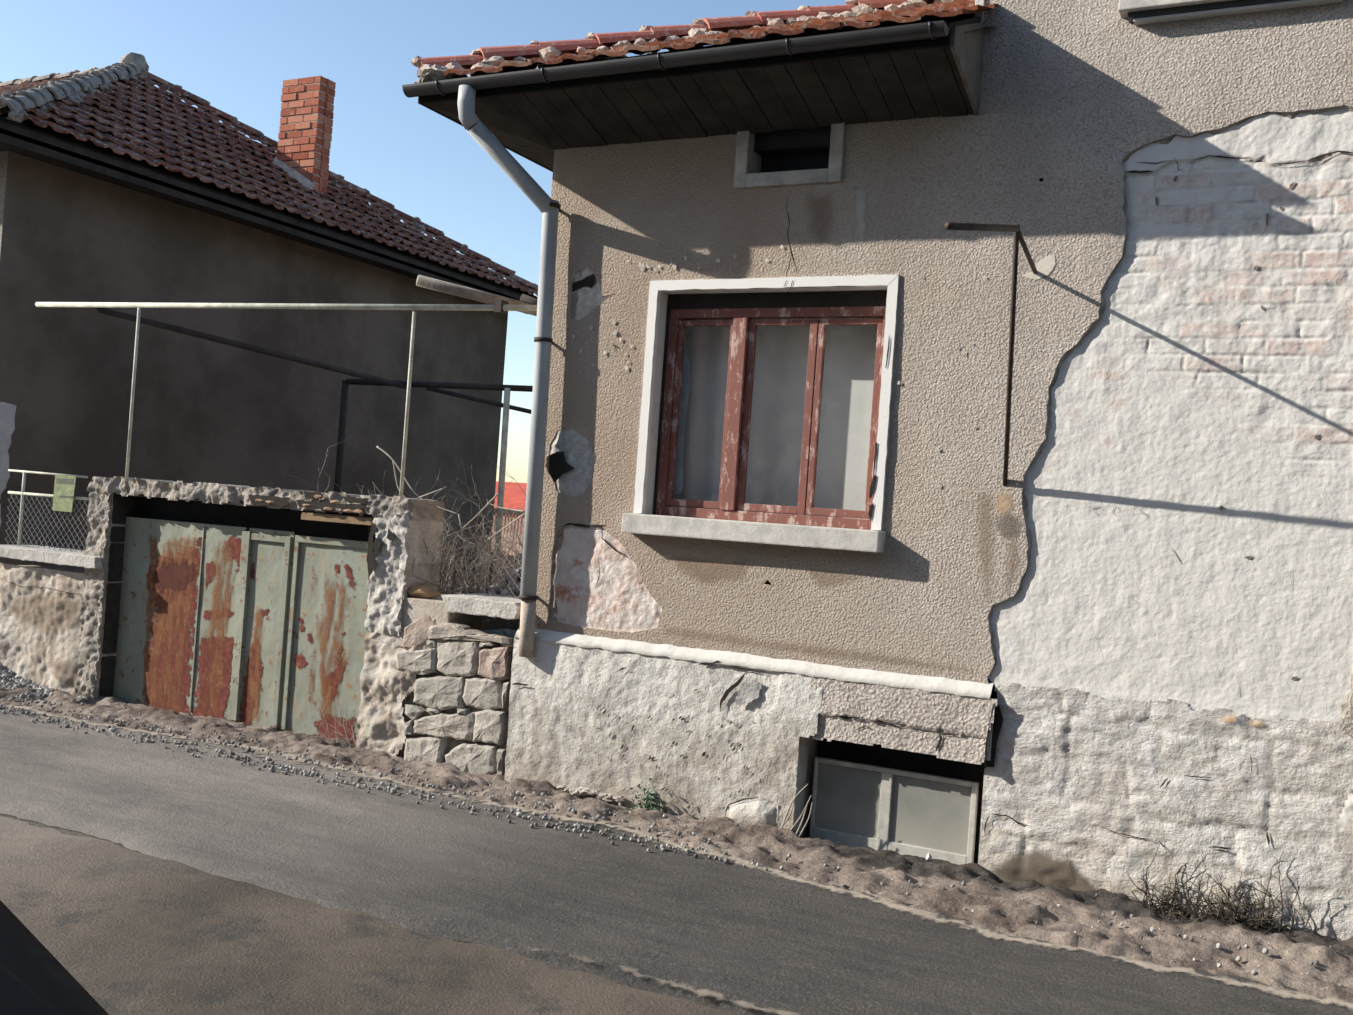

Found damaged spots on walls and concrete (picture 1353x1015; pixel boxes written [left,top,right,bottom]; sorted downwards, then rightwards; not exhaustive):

spalling [569,267,633,371]
crack [784,199,797,292]
corrosion [142,536,269,725]
corrosion [295,564,356,745]
peeling [548,523,662,632]
flaking render [979,105,1353,940]